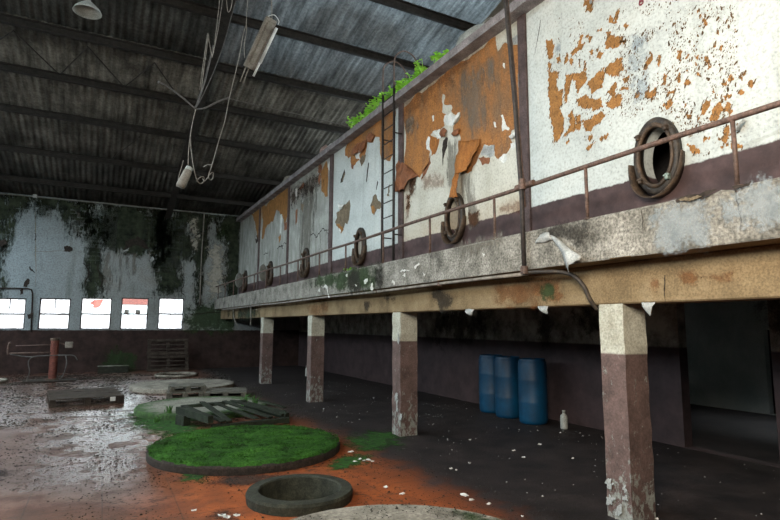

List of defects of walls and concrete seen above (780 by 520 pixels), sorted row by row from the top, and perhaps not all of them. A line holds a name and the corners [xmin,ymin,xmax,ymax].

peeling [546,0,757,156]
peeling [340,35,519,215]
peeling [252,182,304,243]
peeling [335,200,351,233]
damp [189,218,225,299]
damp [347,269,361,294]
peeling [605,478,628,516]